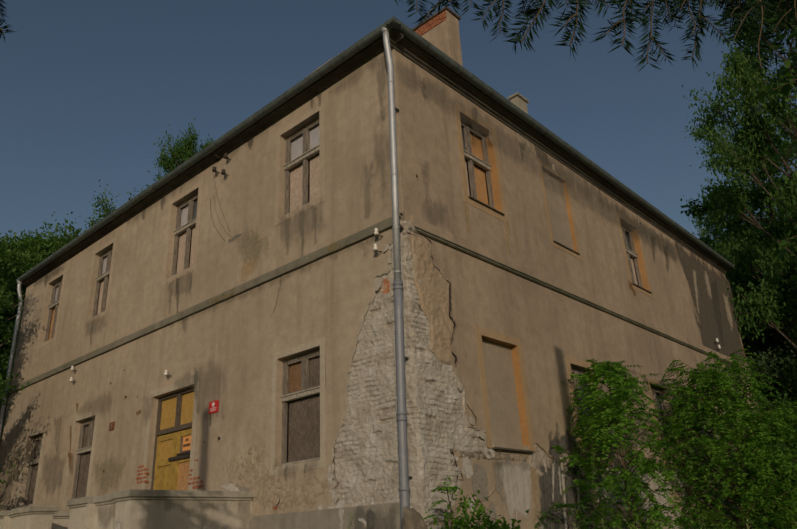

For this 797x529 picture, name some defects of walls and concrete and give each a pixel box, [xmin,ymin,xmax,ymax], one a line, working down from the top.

flaking render [222,212,579,529]
crack [425,237,458,364]